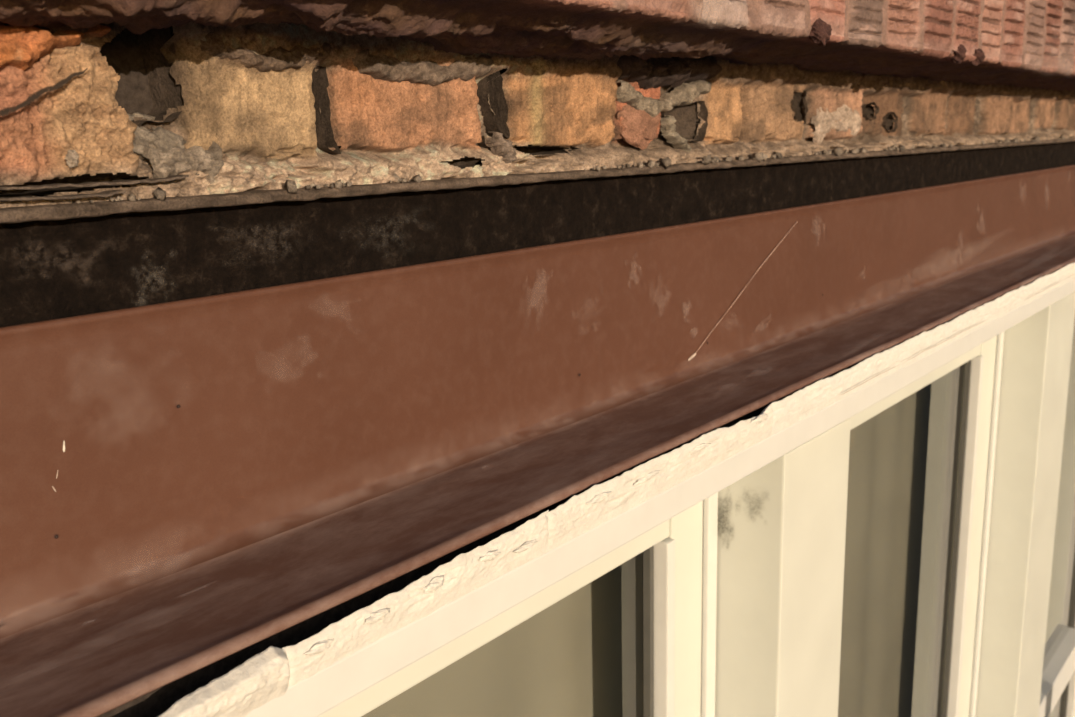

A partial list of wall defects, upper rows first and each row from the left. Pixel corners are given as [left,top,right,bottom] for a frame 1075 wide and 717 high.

spalling [0,23,111,71]
crack [0,68,88,116]
spalling [615,105,661,150]
peeling [0,150,149,202]
peeling [443,156,482,168]
peeling [513,145,581,157]
peeling [750,413,768,426]